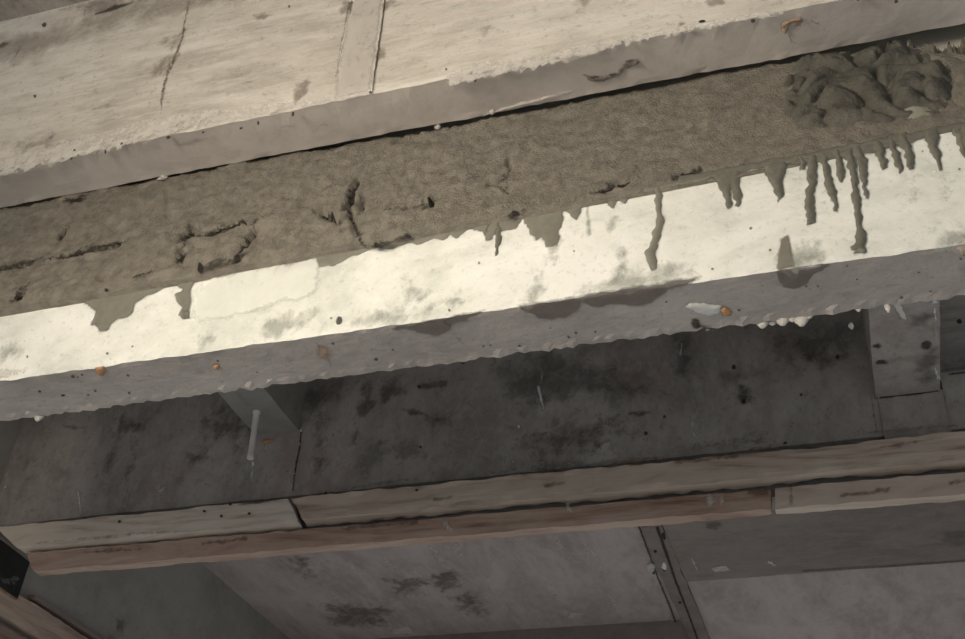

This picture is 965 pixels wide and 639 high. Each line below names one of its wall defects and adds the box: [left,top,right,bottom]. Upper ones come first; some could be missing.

crack [160,9,188,104]
crack [369,0,385,94]
crack [346,182,365,246]
leakage [0,38,965,331]